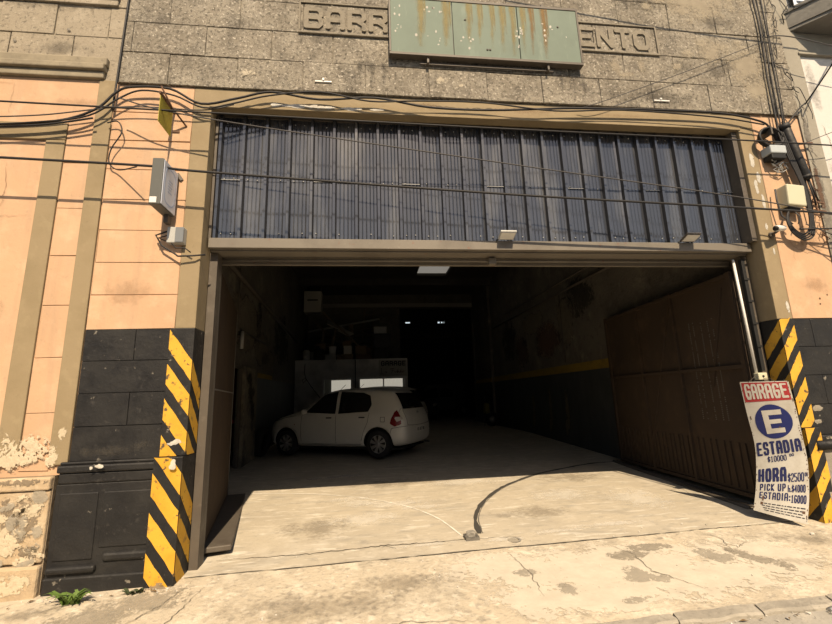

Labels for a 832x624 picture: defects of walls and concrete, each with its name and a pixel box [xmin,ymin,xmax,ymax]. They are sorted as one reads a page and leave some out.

spalling [814,161,832,248]
peeling [0,428,67,598]